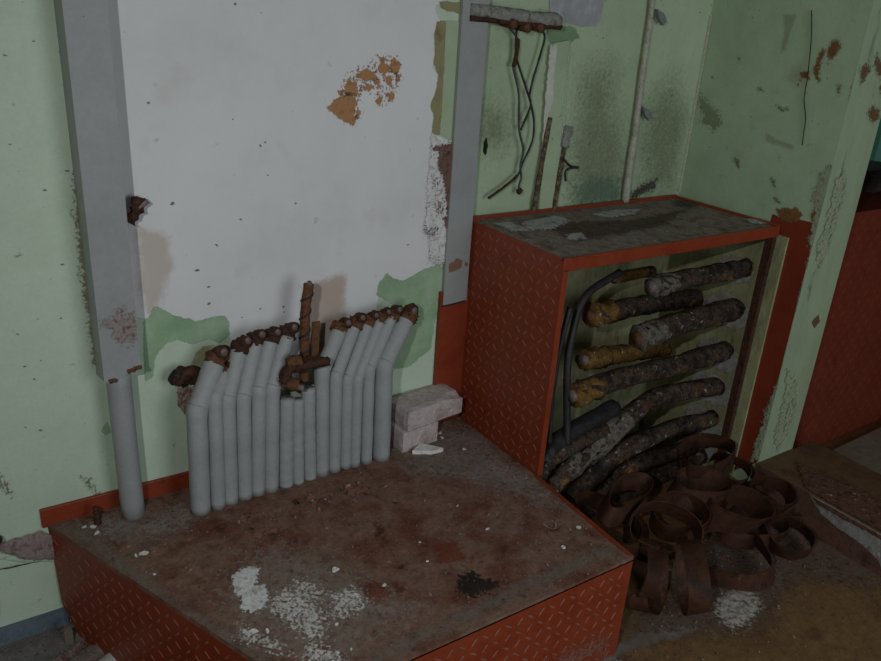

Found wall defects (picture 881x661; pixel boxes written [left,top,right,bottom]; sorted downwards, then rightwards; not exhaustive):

spalling [328,54,401,128]
corrosion [799,39,841,81]
corrosion [847,52,881,105]
corrosion [868,106,881,122]
peeling [377,1,460,369]
spalling [795,164,845,312]
peeling [144,306,230,380]
peeling [750,368,881,577]